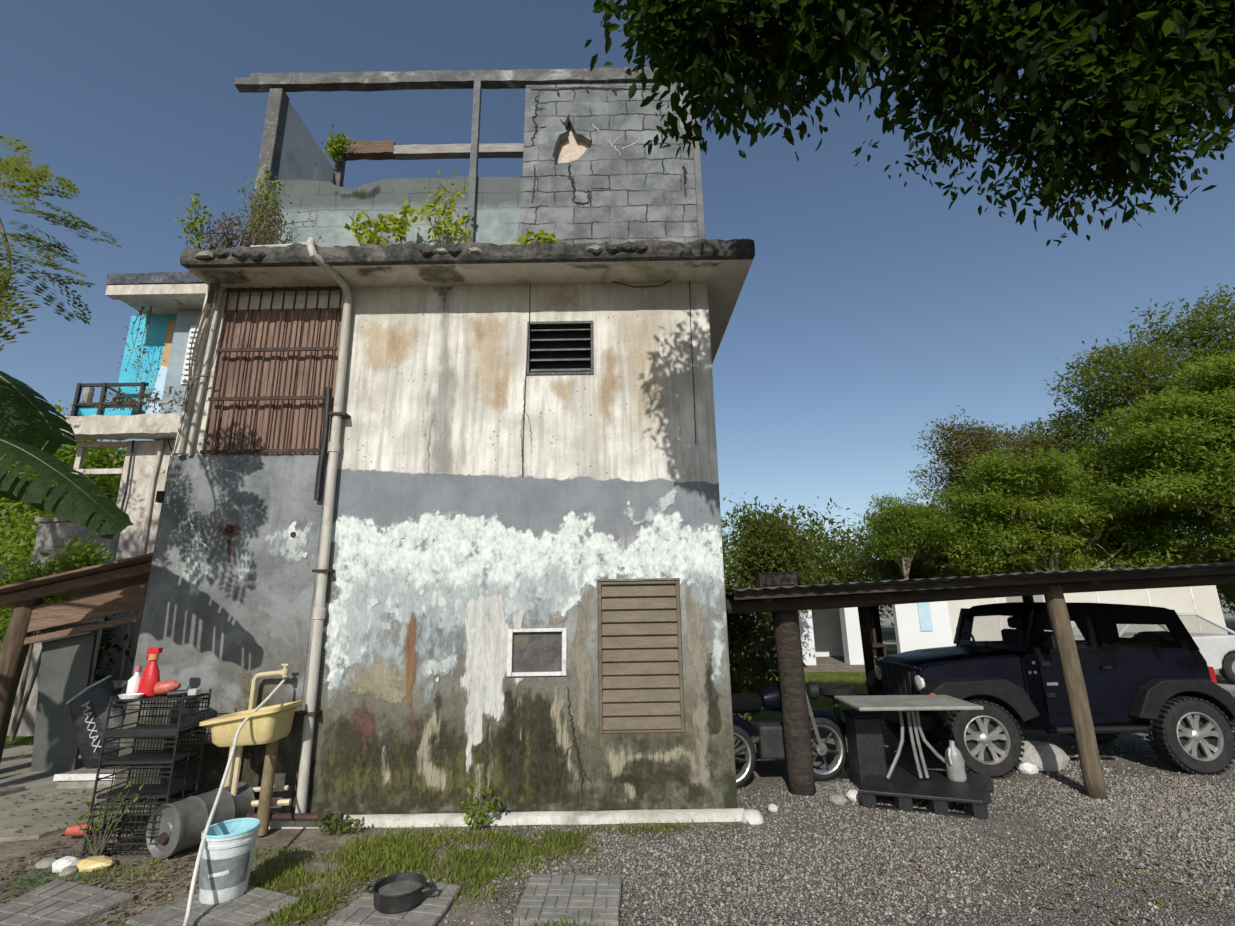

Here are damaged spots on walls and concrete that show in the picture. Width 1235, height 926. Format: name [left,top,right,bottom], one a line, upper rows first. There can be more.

spalling [552,117,592,164]
crack [531,86,651,205]
peeling [177,511,223,595]
peeling [237,550,250,580]
peeling [265,522,312,561]
corrosion [405,613,421,730]
peeling [323,488,727,787]
leakage [513,609,547,629]
leakage [705,653,721,734]
leakage [321,678,578,808]
leakage [608,746,708,798]